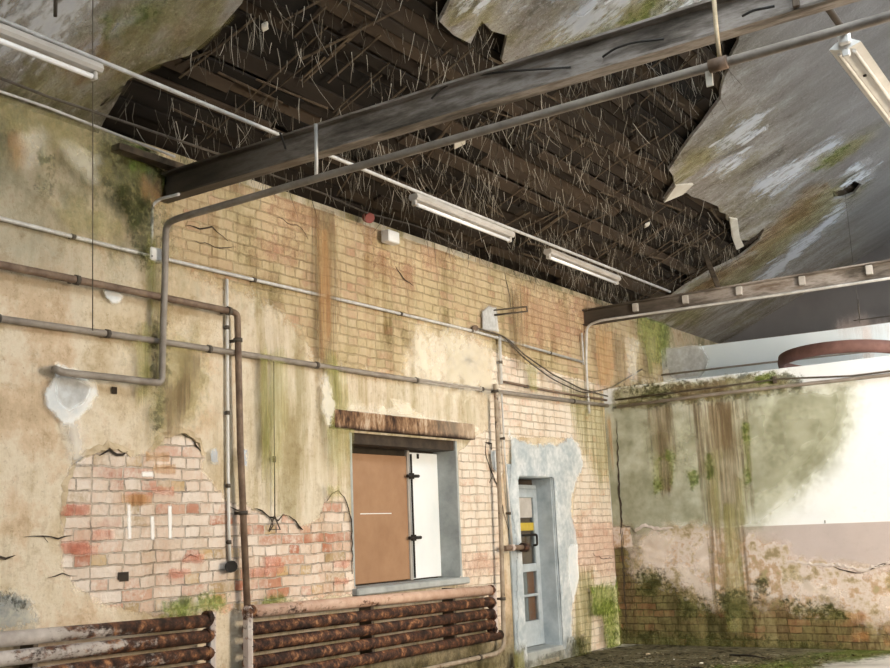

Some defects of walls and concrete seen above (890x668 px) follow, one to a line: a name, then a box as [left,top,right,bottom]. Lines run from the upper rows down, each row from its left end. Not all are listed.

peeling [1,0,96,41]
peeling [556,0,630,38]
peeling [710,114,765,173]
peeling [754,142,839,196]
peeling [841,163,867,187]
damp [100,139,170,287]
damp [143,323,190,433]
flaking render [164,183,890,653]
damp [605,346,845,582]
crack [27,534,67,542]
flaking render [60,426,355,615]